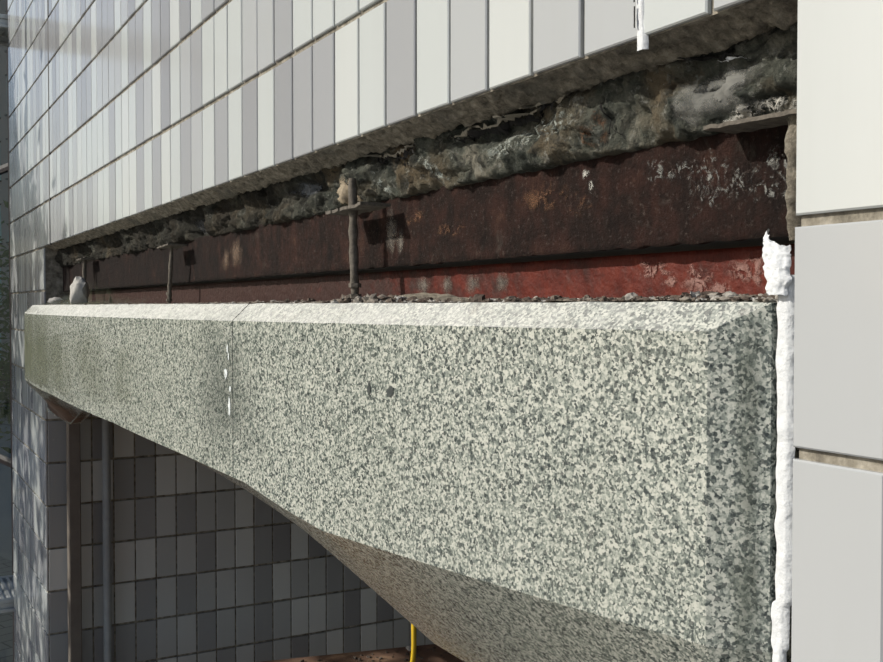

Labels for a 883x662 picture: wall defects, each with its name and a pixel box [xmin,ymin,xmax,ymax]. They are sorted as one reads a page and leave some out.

spalling [676,70,744,115]
spalling [337,179,361,204]
leakage [651,154,787,206]
peeling [642,264,727,293]
peeling [733,257,764,283]